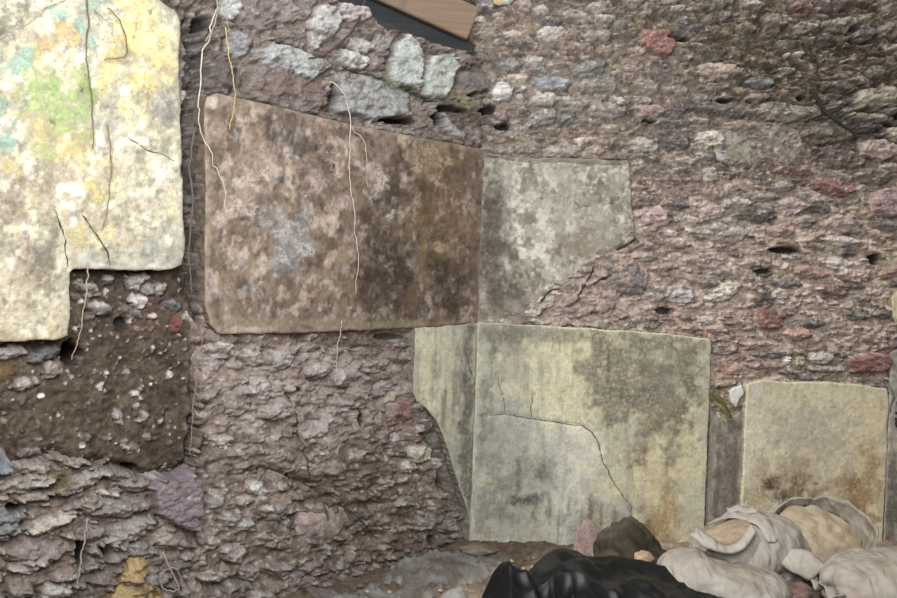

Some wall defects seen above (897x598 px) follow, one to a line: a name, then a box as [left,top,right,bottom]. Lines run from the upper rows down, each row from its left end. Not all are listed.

crack [465,209,632,515]
crack [228,388,378,539]
damp [459,372,488,533]